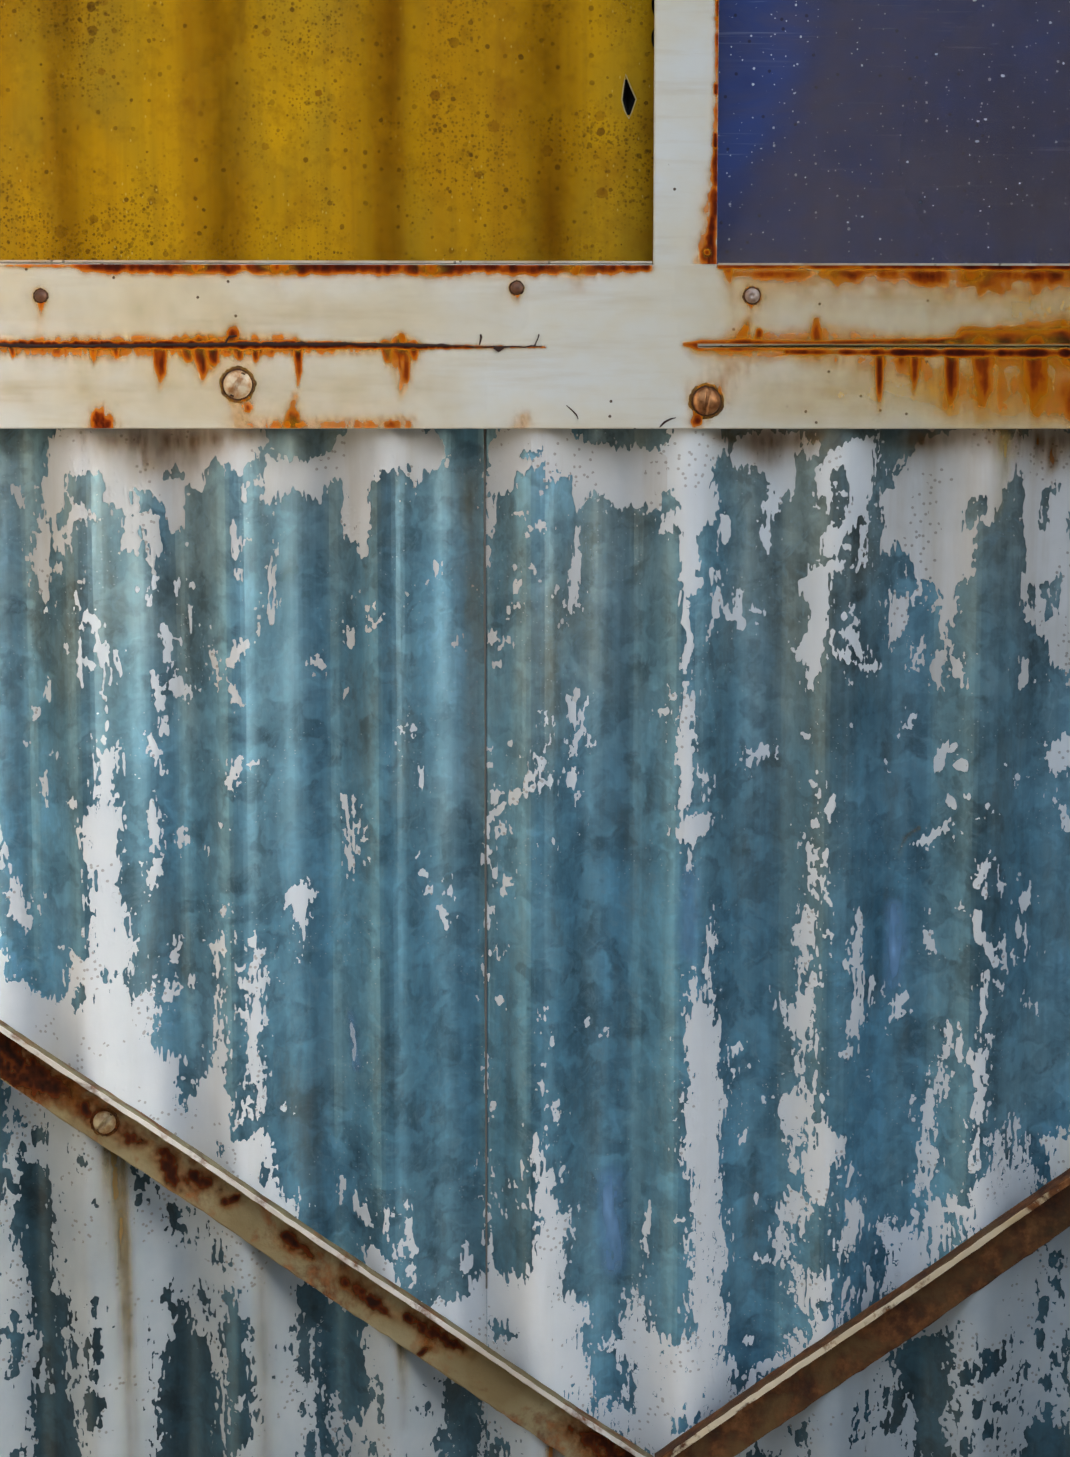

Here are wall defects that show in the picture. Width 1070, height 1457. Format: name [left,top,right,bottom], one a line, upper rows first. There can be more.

rust [0,326,546,464]
rust [6,264,653,277]
rust [683,0,1070,468]
peeling [477,429,1070,880]
peeling [0,429,451,1219]
peeling [475,687,596,1011]
peeling [0,1079,115,1457]
rust [0,1032,241,1346]
peeling [130,1165,522,1457]
rust [338,1275,467,1360]
rust [547,1421,635,1457]
peeling [336,770,1070,1457]